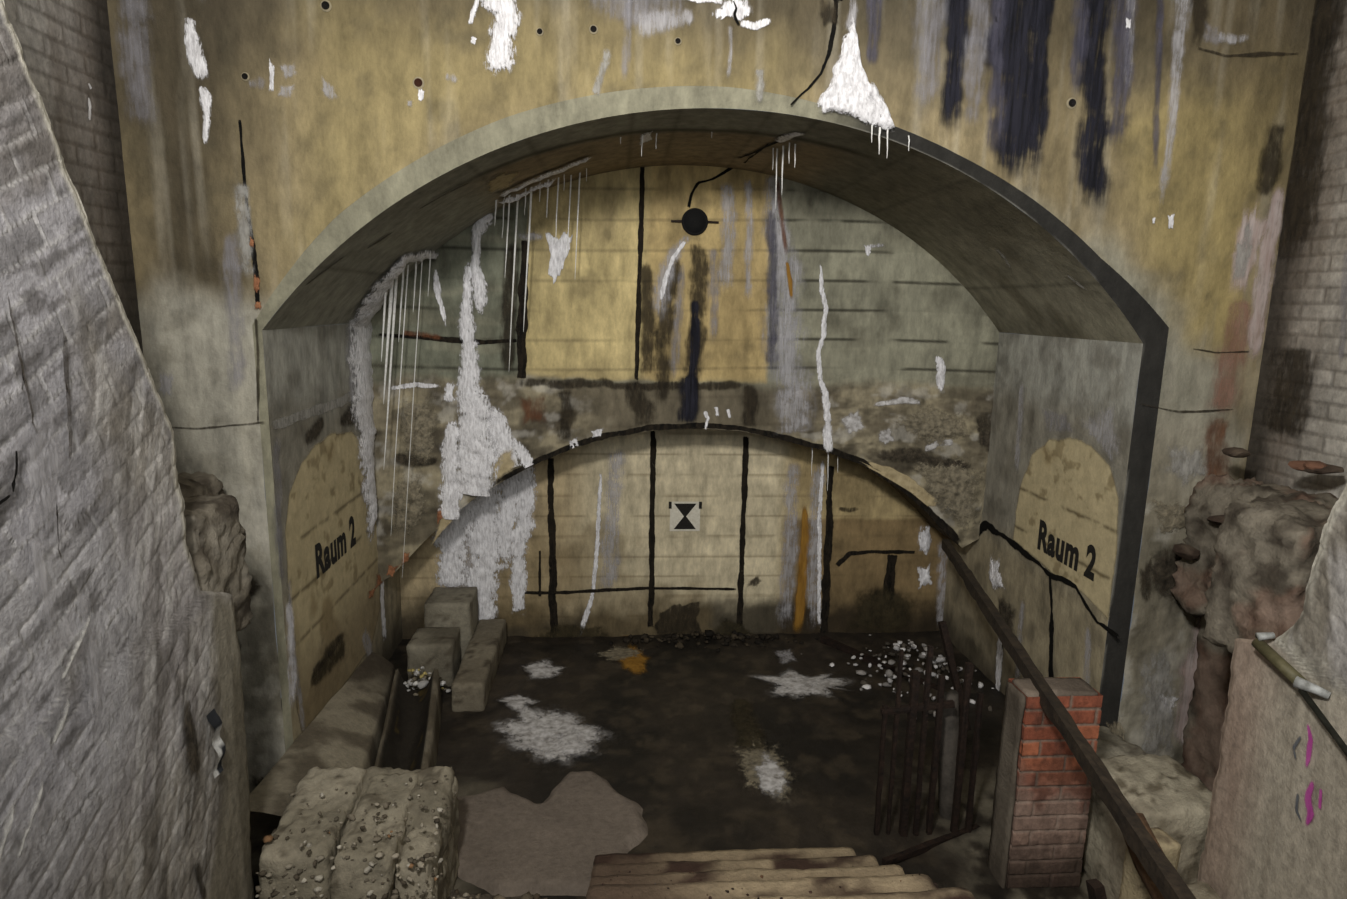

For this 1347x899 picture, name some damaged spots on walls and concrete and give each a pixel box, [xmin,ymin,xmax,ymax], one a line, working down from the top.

efflorescence [469,0,521,73]
crack [790,0,881,105]
efflorescence [817,3,895,155]
water stain [942,0,1054,172]
crack [687,141,778,208]
spalling [391,382,455,541]
water stain [346,213,538,620]
flaking render [492,452,514,479]
peeling [569,429,603,448]
water stain [626,178,838,629]
spalling [862,397,991,531]
crack [979,521,1119,677]